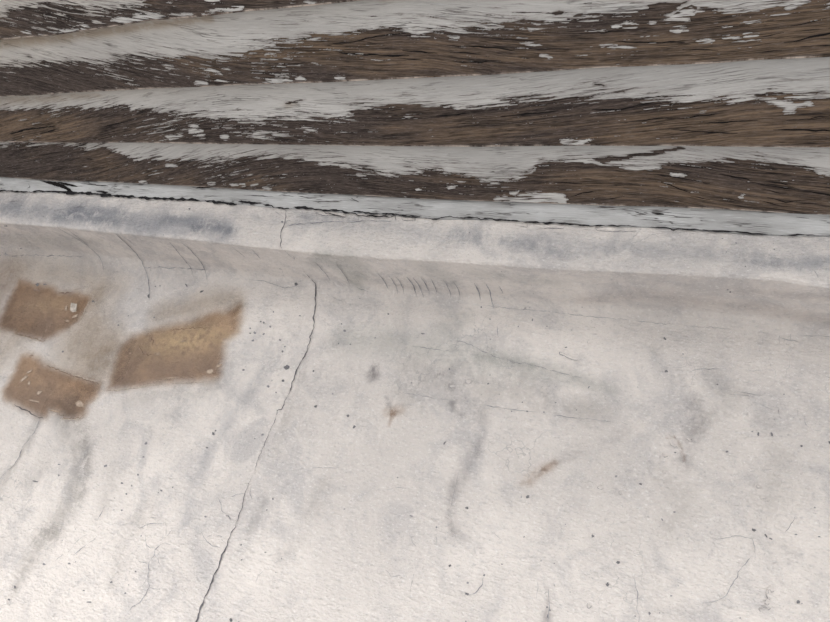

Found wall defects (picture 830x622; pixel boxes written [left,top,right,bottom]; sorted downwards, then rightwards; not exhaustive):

crack [8,126,58,135]
peeling [0,0,830,203]
spalling [64,300,94,322]
crack [0,165,830,622]